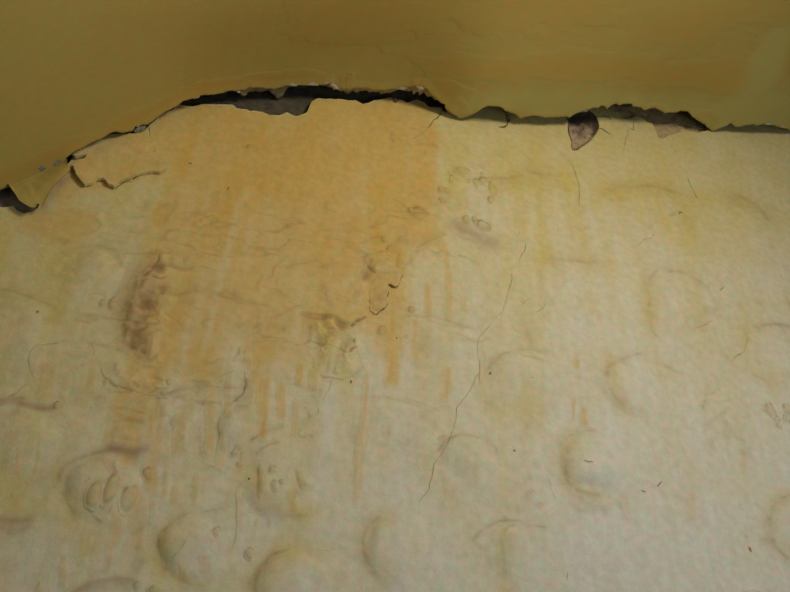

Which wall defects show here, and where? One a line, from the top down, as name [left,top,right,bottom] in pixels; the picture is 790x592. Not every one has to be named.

spalling [181,89,315,116]
spalling [567,110,599,150]
spalling [605,106,706,139]
spalling [0,187,39,213]
water stain [0,67,508,592]